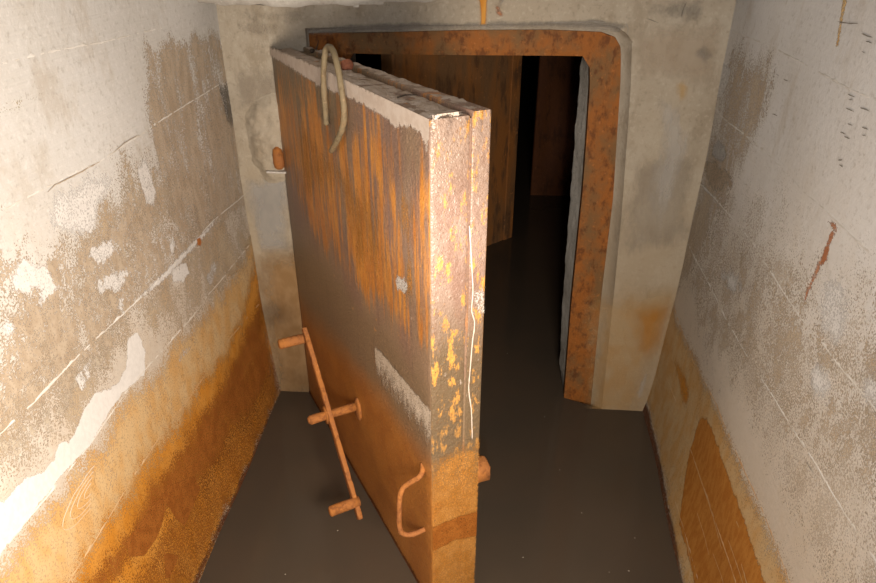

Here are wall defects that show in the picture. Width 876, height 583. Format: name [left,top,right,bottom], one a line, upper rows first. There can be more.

corrosion [480,0,502,24]
leakage [0,28,310,583]
leakage [643,304,786,583]
leakage [677,37,876,583]
corrosion [805,222,837,300]